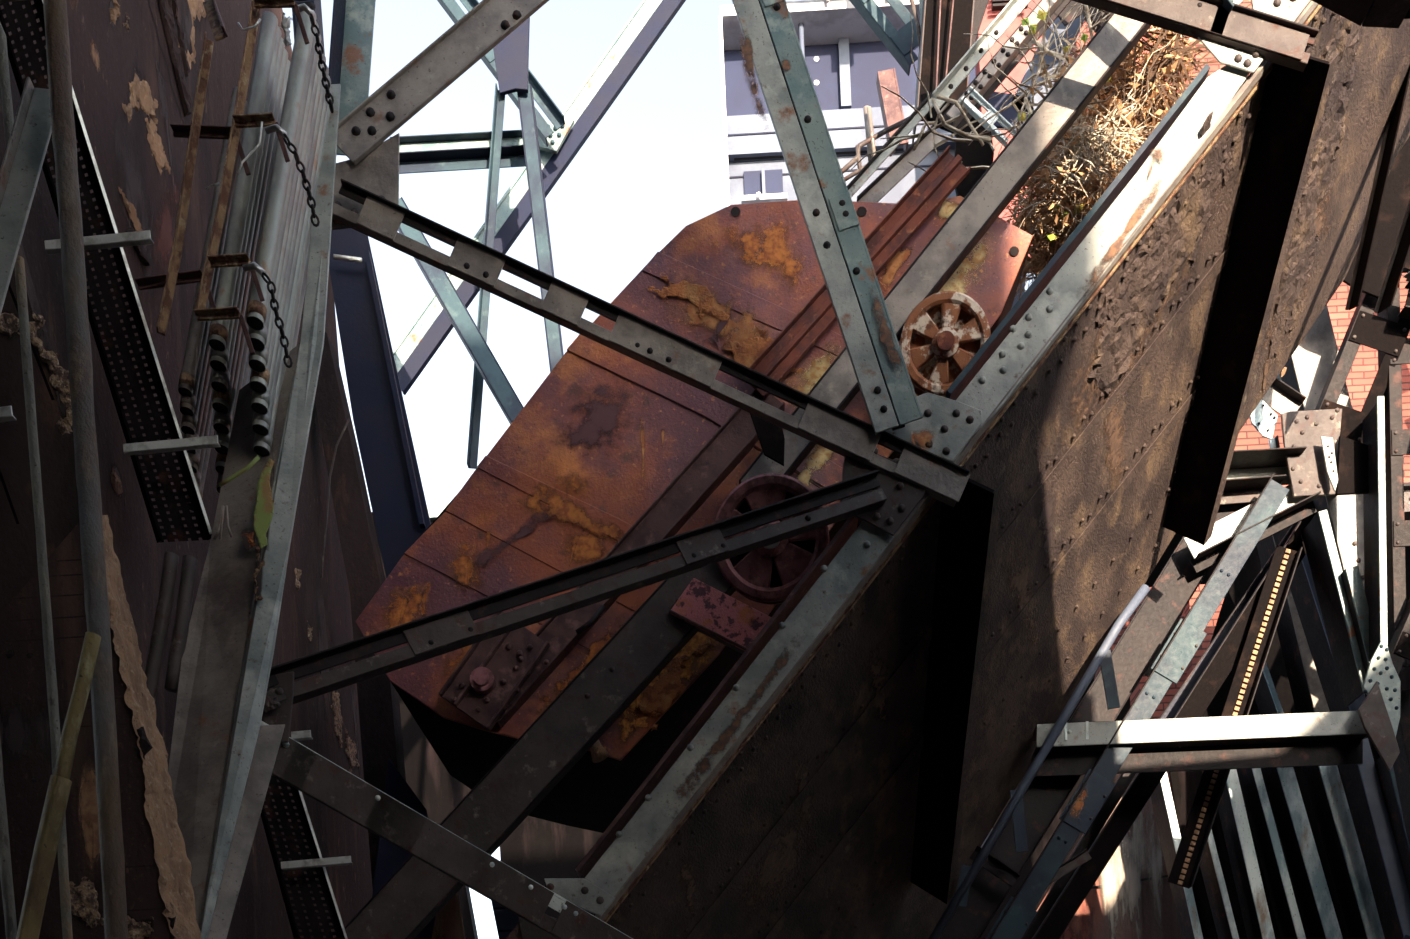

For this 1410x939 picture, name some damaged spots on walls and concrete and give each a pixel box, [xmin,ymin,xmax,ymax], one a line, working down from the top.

spalling [109,0,130,32]
spalling [178,0,206,70]
spalling [122,68,171,175]
corrosion [714,222,803,285]
corrosion [675,293,768,353]
corrosion [871,249,912,366]
corrosion [562,384,665,478]
corrosion [911,430,933,448]
corrosion [447,474,623,586]
corrosion [384,583,431,629]
corrosion [619,632,716,742]
corrosion [673,641,800,819]